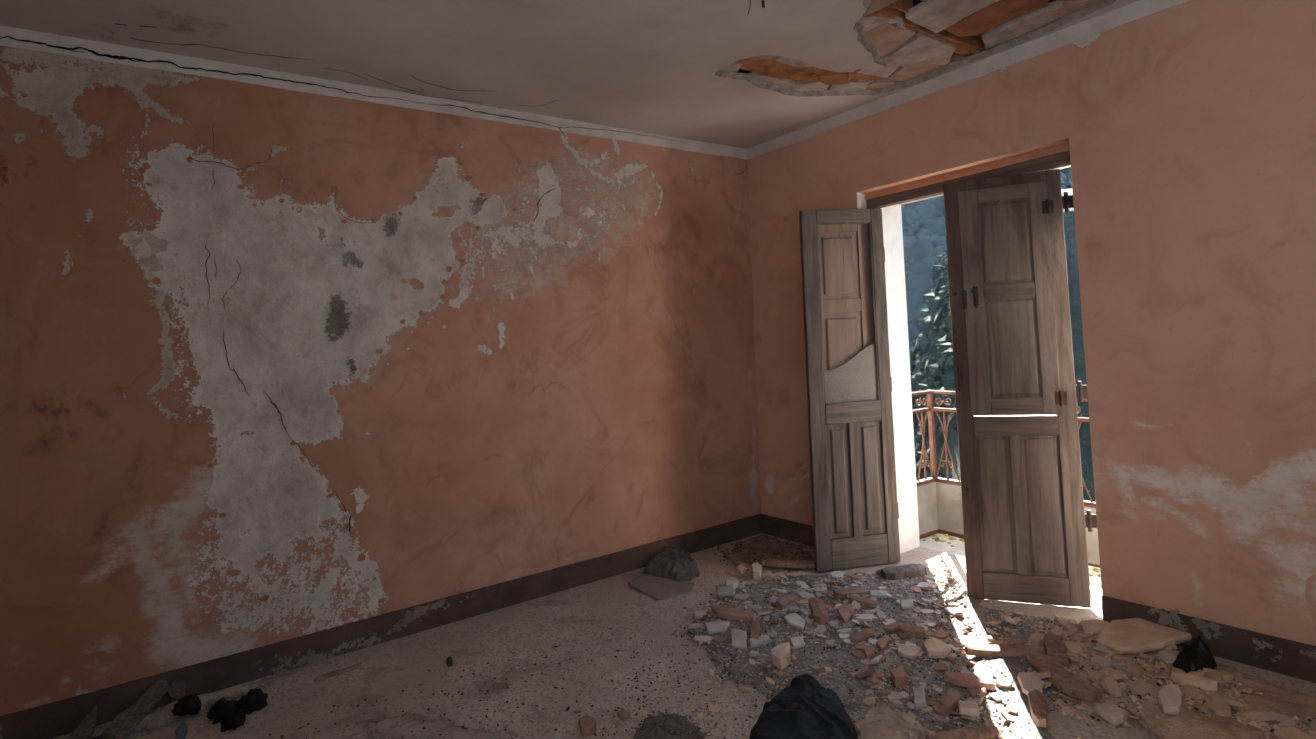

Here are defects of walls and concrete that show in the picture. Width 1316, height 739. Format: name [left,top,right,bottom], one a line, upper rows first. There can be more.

crack [191,123,273,191]
crack [0,24,685,143]
spalling [715,0,1117,97]
crack [205,244,313,466]
peeling [0,47,684,681]
damp [1091,438,1316,642]